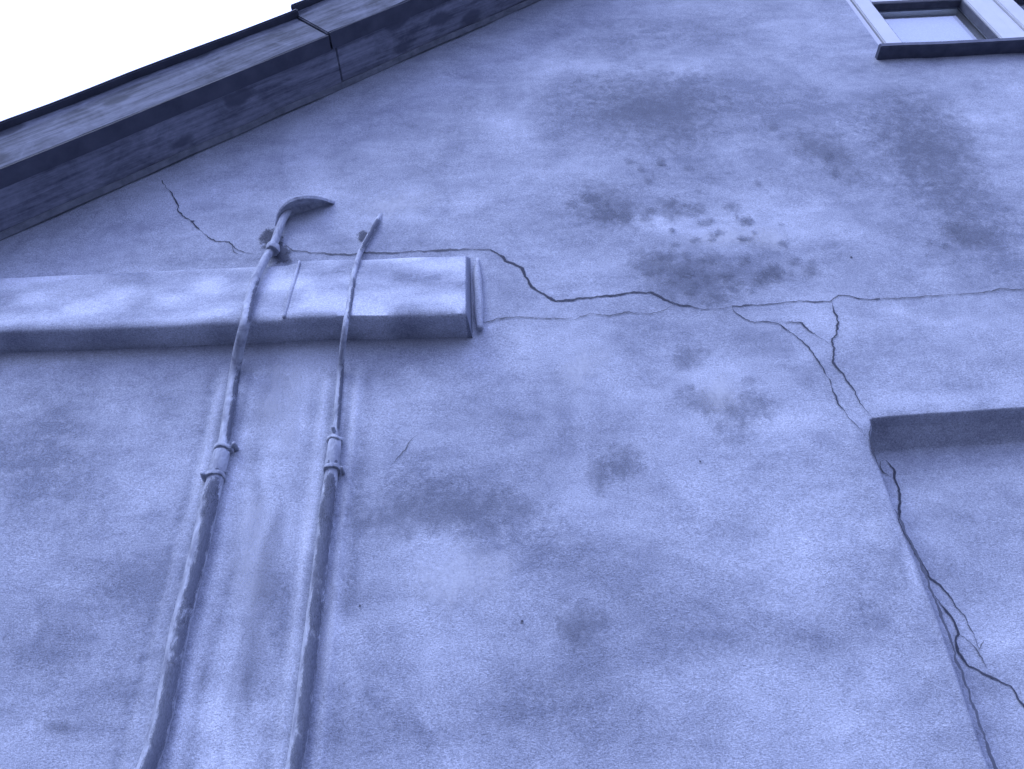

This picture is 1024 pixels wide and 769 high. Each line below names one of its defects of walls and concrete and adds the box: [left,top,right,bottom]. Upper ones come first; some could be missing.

crack [162,180,252,254]
crack [287,246,1024,769]